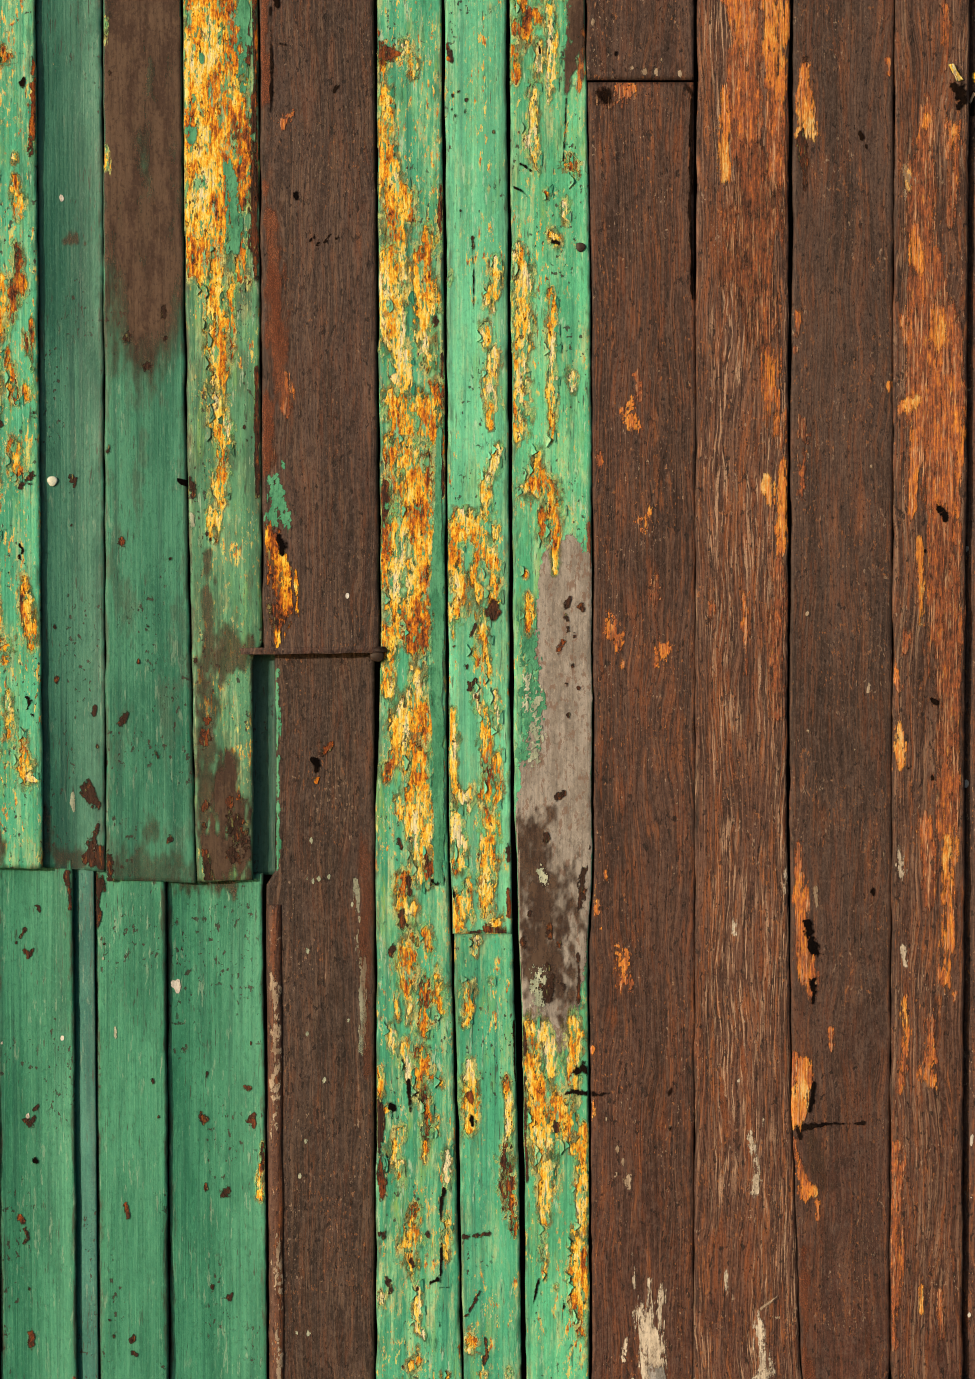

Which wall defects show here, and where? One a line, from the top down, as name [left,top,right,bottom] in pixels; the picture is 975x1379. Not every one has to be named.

peeling [7,151,28,224]
peeling [177,0,260,545]
peeling [0,271,36,490]
peeling [0,601,19,758]
peeling [377,0,592,1346]
peeling [464,1323,489,1379]
peeling [621,1254,667,1379]
peeling [752,1310,775,1379]